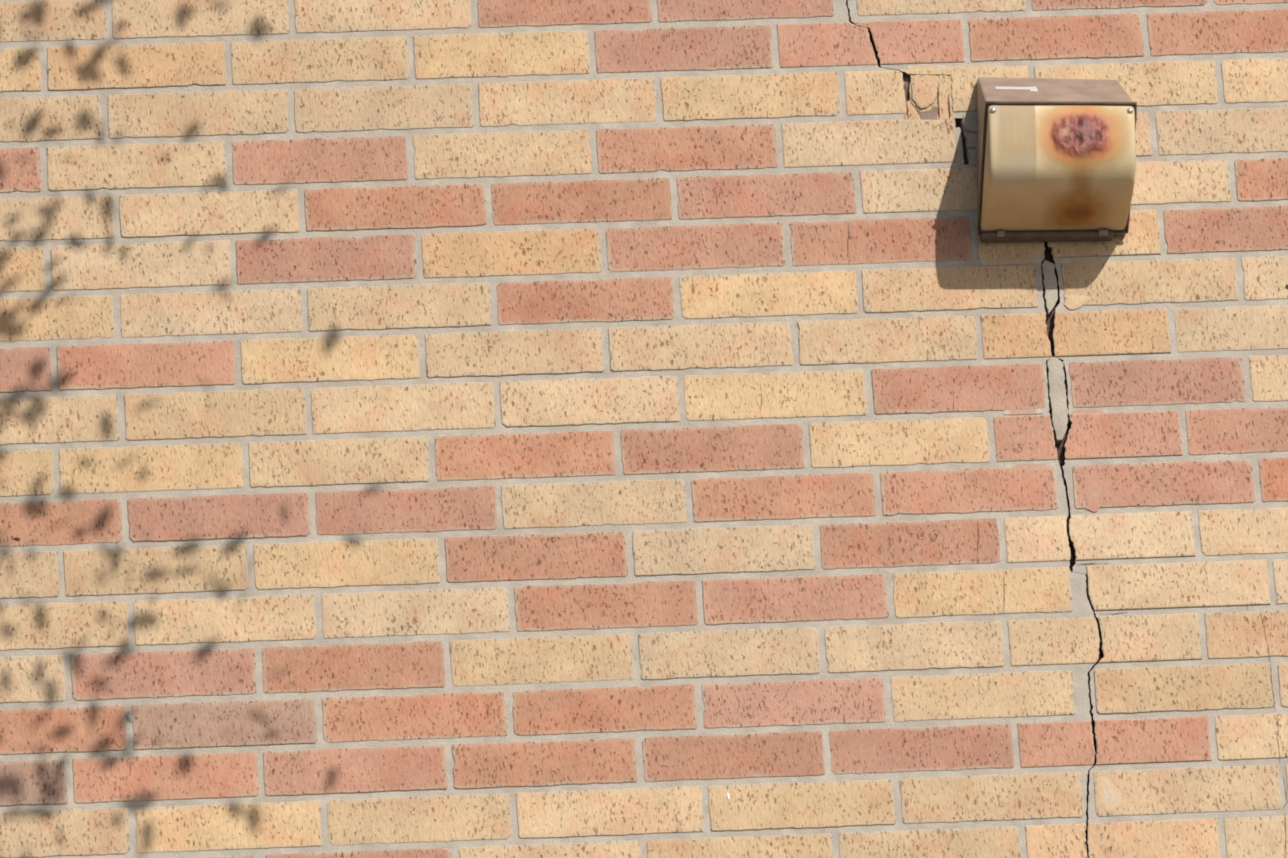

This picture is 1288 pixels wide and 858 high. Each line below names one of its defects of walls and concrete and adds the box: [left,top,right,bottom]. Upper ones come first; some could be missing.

crack [846,0,977,166]
crack [1041,242,1127,856]